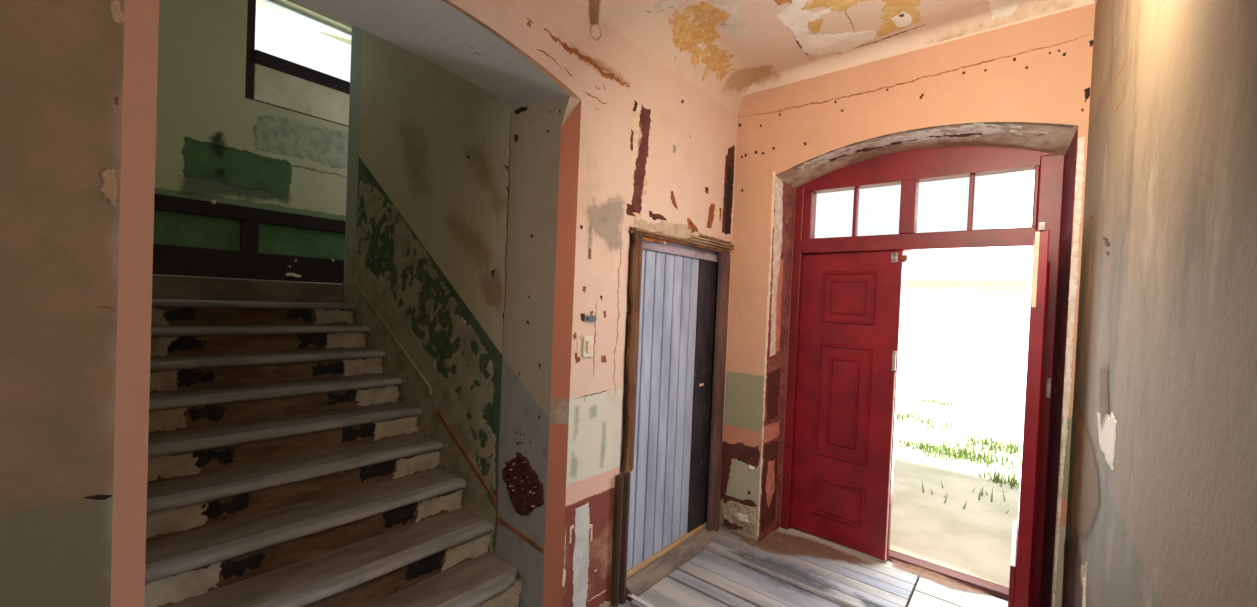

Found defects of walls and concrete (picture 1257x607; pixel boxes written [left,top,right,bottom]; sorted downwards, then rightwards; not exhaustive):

peeling [774,0,877,58]
crack [845,11,924,48]
crack [737,34,1090,118]
peeling [182,115,348,204]
peeling [626,100,775,244]
peeling [150,307,216,392]
peeling [286,181,544,581]
peeling [149,405,227,432]
peeling [147,447,236,483]
peeling [1097,412,1117,472]
peeling [146,493,251,539]
peeling [144,551,266,607]